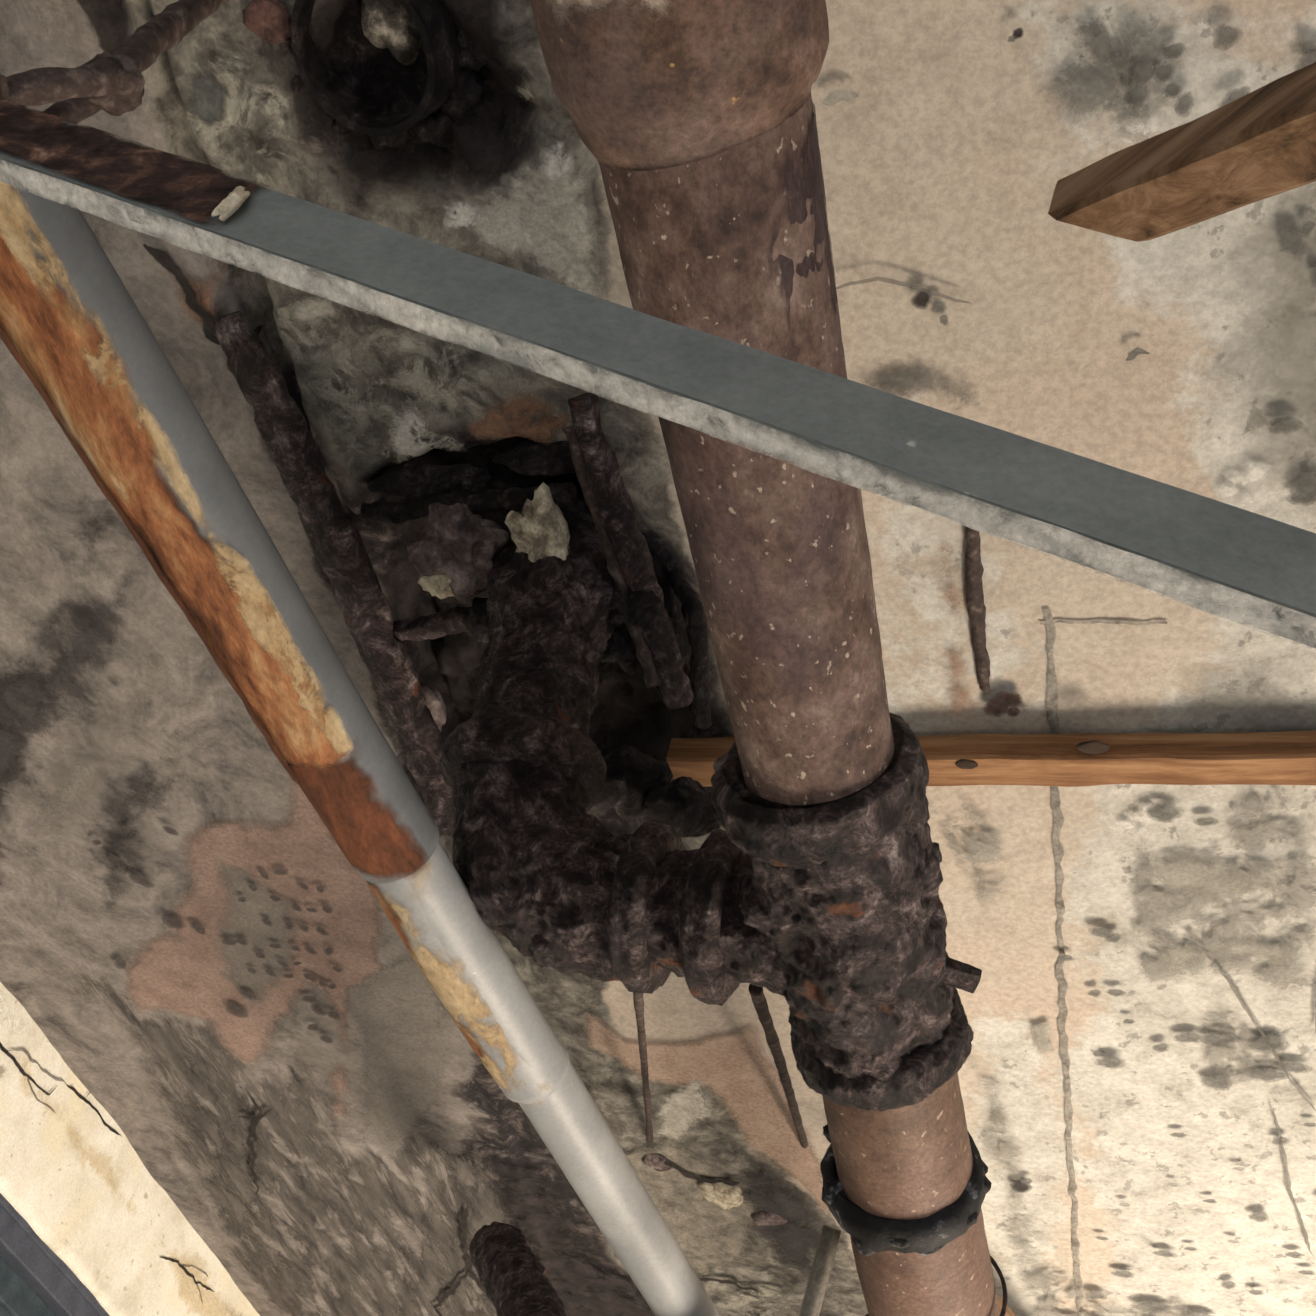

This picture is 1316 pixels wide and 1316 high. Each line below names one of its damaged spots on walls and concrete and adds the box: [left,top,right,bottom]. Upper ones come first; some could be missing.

peeling [1008,28,1023,42]
leakage [1056,22,1193,145]
leakage [1214,25,1242,49]
leakage [447,144,601,296]
spalling [0,160,1316,838]
leakage [1222,462,1267,503]
leakage [1287,472,1316,505]
leakage [0,599,122,796]
peeling [91,840,154,887]
leakage [100,777,160,893]
peeling [115,783,444,1158]
crack [0,1043,122,1137]